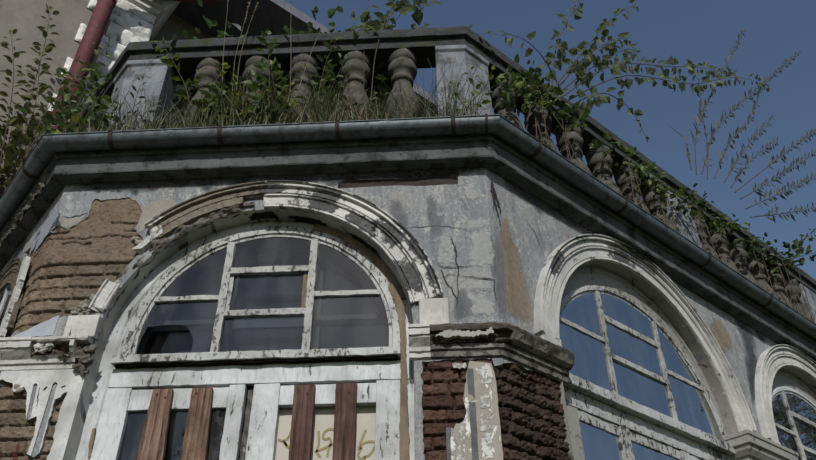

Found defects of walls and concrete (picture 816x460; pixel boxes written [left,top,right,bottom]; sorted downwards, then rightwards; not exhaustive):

crack [491,179,502,215]
crack [410,225,497,309]
peeling [462,217,495,267]
spalling [0,170,485,460]
spalling [421,359,571,460]